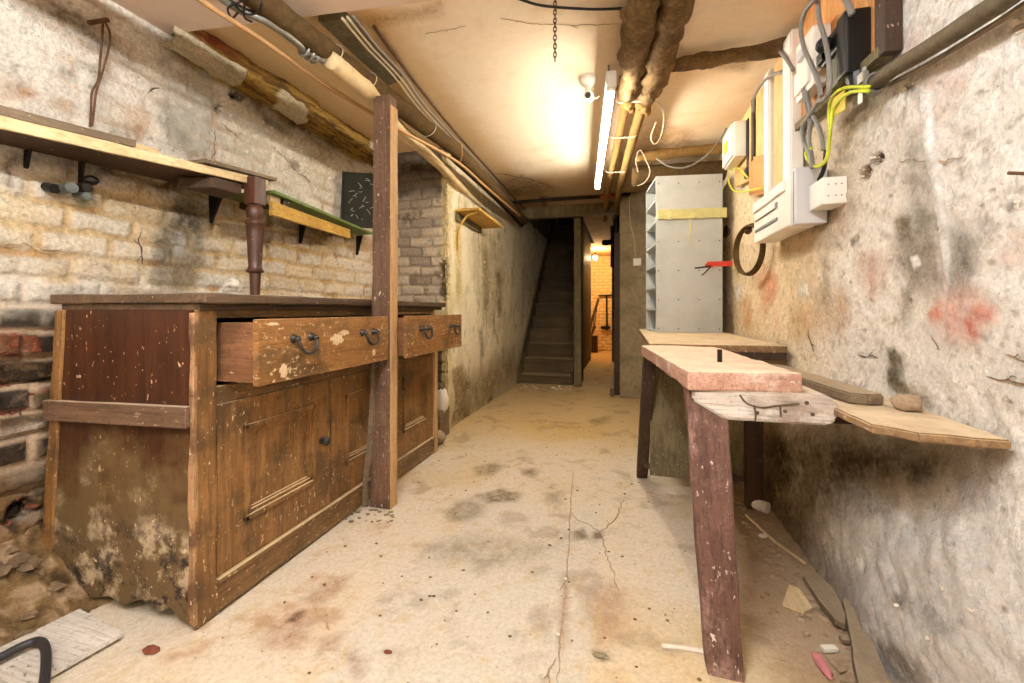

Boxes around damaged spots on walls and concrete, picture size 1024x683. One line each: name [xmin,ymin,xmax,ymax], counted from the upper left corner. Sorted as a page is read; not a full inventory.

crack [500,18,610,28]
leakage [901,93,971,290]
flaking render [0,333,52,416]
leakage [888,349,923,400]
crack [544,473,624,683]